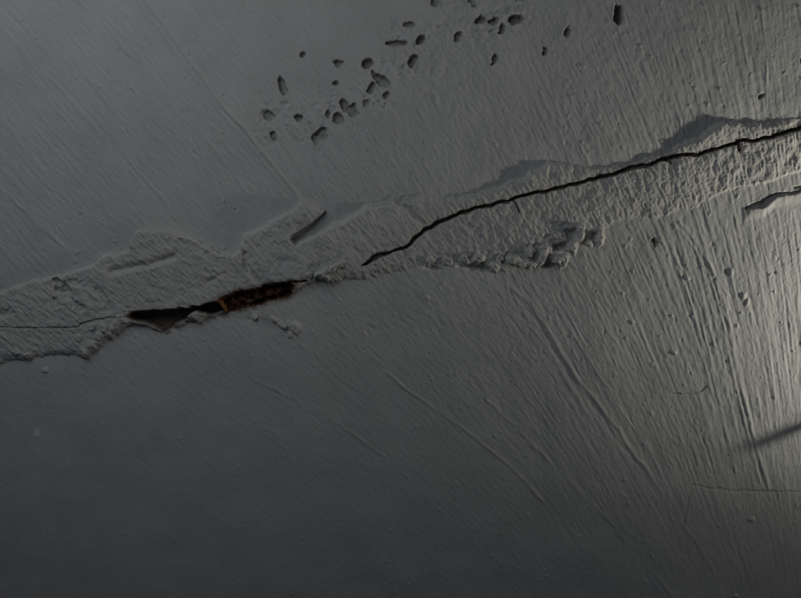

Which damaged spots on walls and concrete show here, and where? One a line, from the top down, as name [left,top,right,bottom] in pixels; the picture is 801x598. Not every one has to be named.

spalling [248,0,537,160]
crack [361,126,801,266]
corrosion [208,277,301,319]